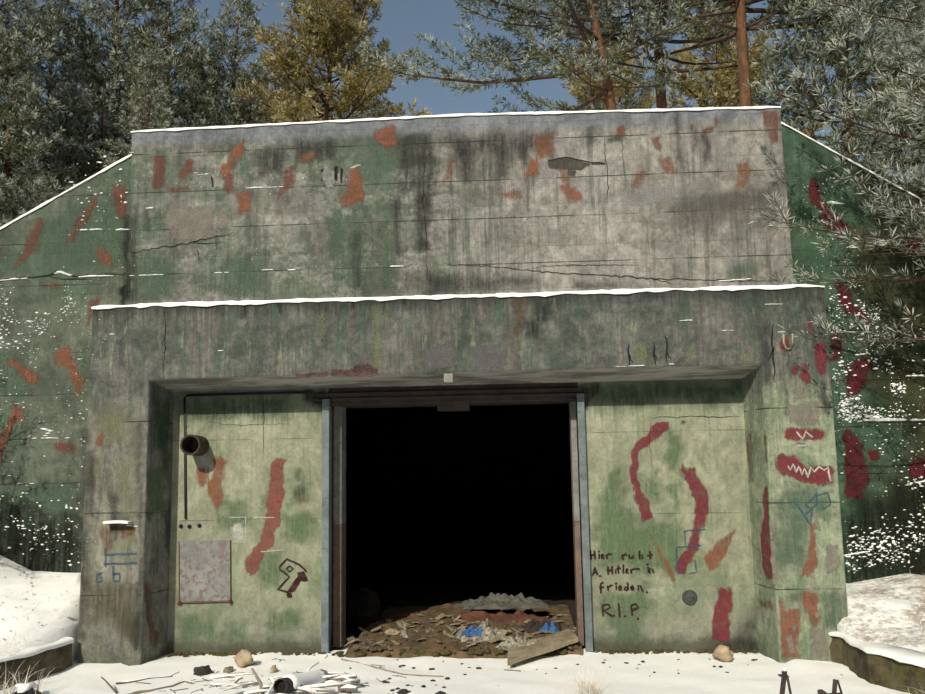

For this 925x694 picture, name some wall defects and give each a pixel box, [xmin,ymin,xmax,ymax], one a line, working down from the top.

crack [2,233,231,280]
leakage [400,135,433,248]
leakage [457,135,543,180]
crack [421,134,785,284]